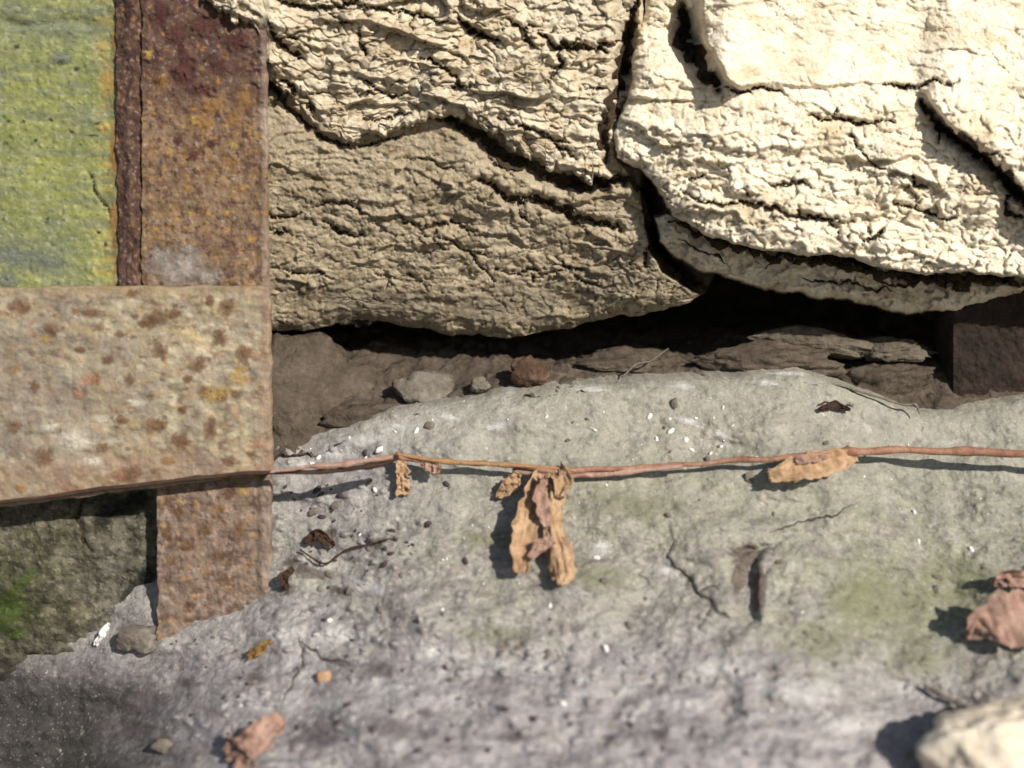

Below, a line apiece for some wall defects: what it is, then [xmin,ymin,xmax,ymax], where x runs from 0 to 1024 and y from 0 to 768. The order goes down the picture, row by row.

rust [115,0,249,297]
rust [206,297,233,315]
rust [139,310,180,327]
rust [153,343,167,359]
rust [184,359,204,382]
rust [200,346,250,400]
rust [173,434,189,447]
crack [770,505,850,533]
crack [666,541,728,628]